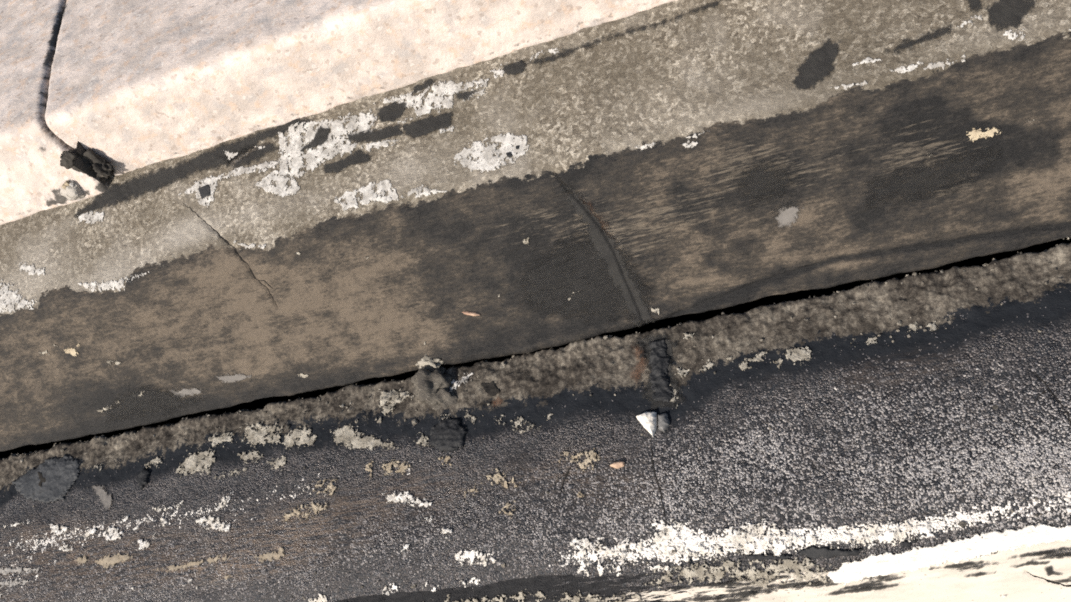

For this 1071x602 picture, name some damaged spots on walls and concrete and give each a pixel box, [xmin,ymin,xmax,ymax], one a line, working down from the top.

peeling [178,64,505,210]
water stain [739,163,799,227]
crack [183,203,277,306]
water stain [103,387,201,421]
water stain [92,486,113,510]
water stain [196,491,234,532]
water stain [0,567,40,598]
water stain [76,553,133,569]
water stain [156,555,229,573]
water stain [929,552,998,577]
water stain [1012,548,1071,584]
crack [1027,572,1071,587]